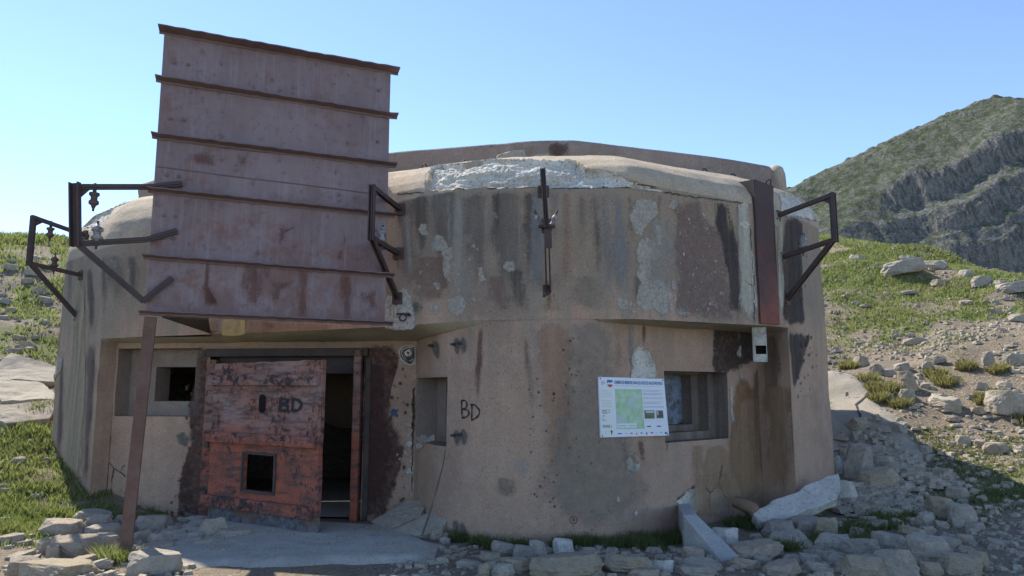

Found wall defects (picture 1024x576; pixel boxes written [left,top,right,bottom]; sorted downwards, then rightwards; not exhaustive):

damp [384,197,461,330]
damp [519,194,544,281]
spalling [418,158,678,317]
damp [362,346,409,516]
spalling [631,345,657,378]
damp [693,203,817,515]